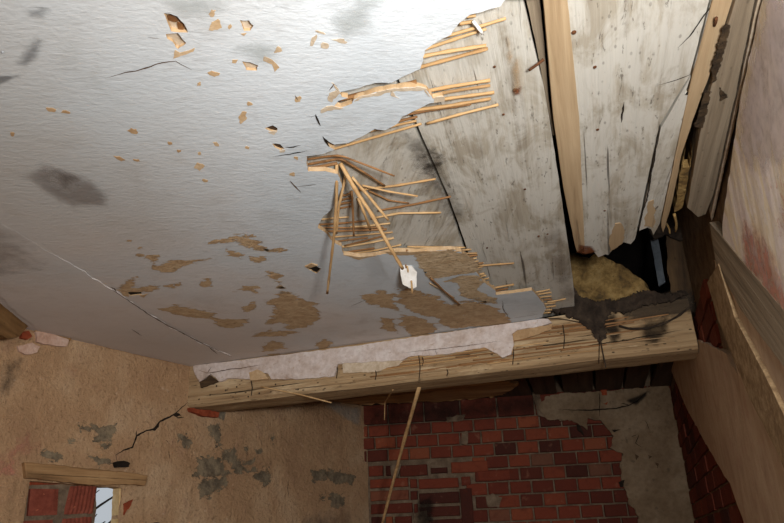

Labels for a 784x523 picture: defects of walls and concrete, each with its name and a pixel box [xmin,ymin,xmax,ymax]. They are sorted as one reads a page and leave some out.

crack [108,61,186,78]
spalling [166,13,195,59]
peeling [209,9,232,31]
spalling [232,46,282,72]
peeling [310,30,347,49]
peeling [127,240,211,273]
peeling [157,286,260,328]
peeling [208,234,321,356]
peeling [359,249,512,337]
spalling [68,420,130,469]
crack [116,402,188,459]
spalling [191,412,271,500]